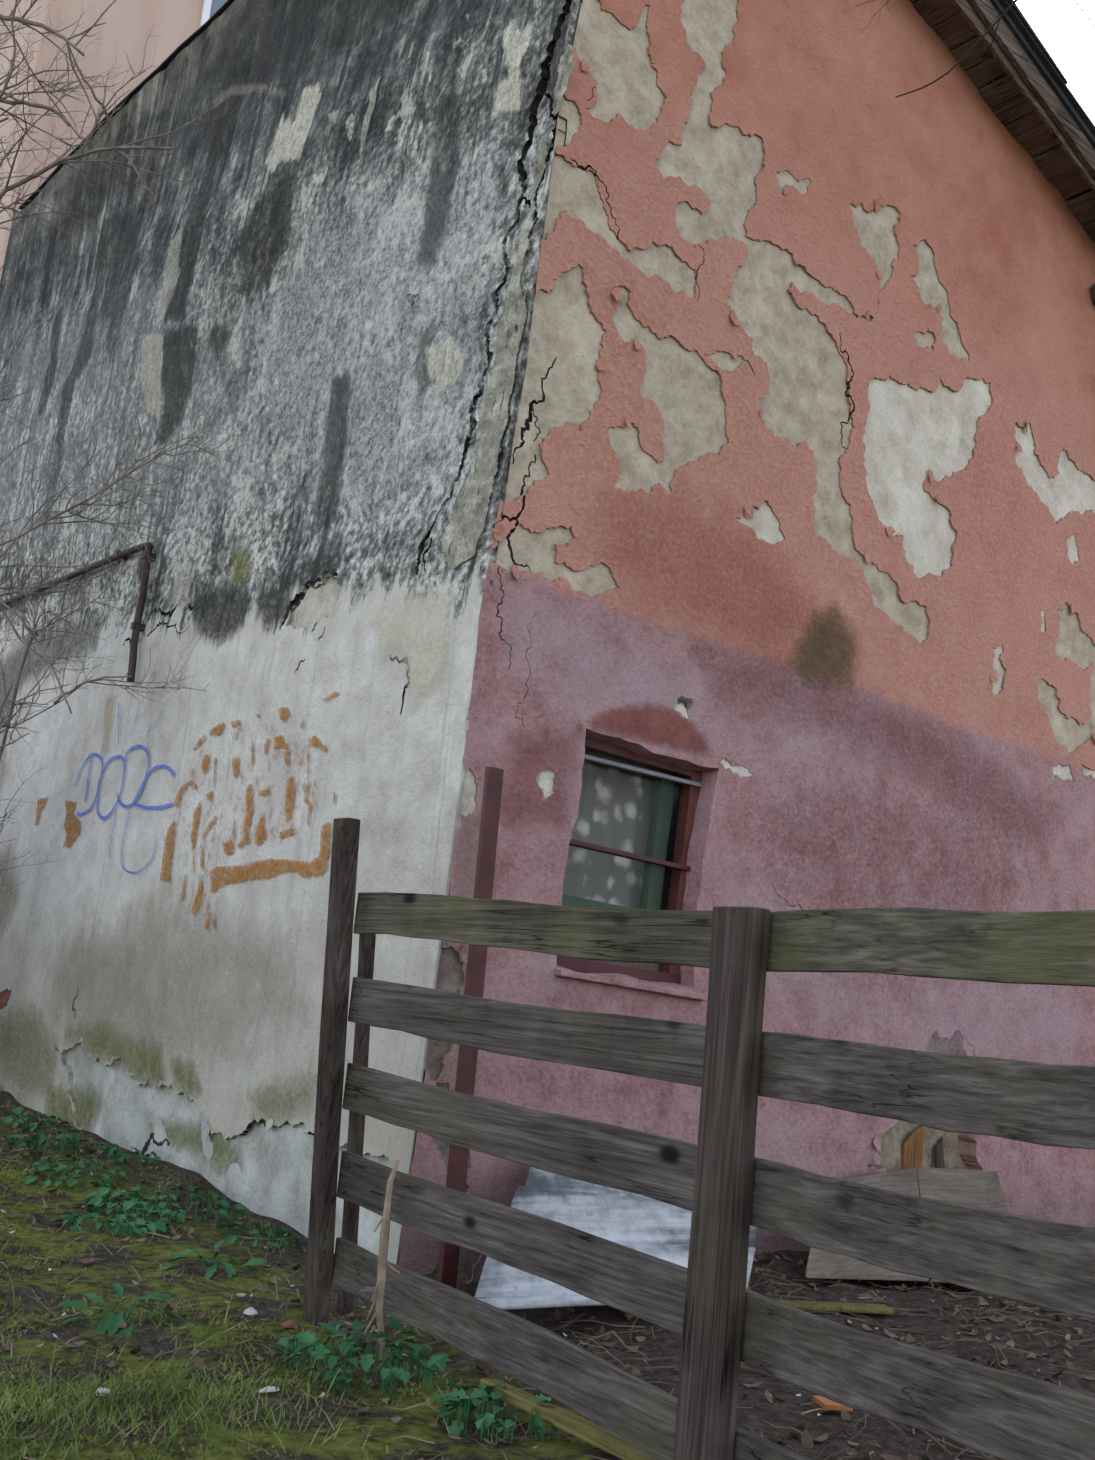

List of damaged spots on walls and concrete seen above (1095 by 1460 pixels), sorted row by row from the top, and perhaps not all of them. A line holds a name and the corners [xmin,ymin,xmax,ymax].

leakage [38,211,138,455]
leakage [141,115,229,443]
leakage [236,84,321,294]
leakage [482,21,534,117]
crack [416,0,620,575]
flaking render [491,0,993,644]
leakage [191,376,348,646]
crack [496,358,556,726]
flaking render [1015,419,1095,565]
flaking render [1037,602,1095,781]
flaking render [55,1041,314,1238]
flaking render [334,1143,399,1265]